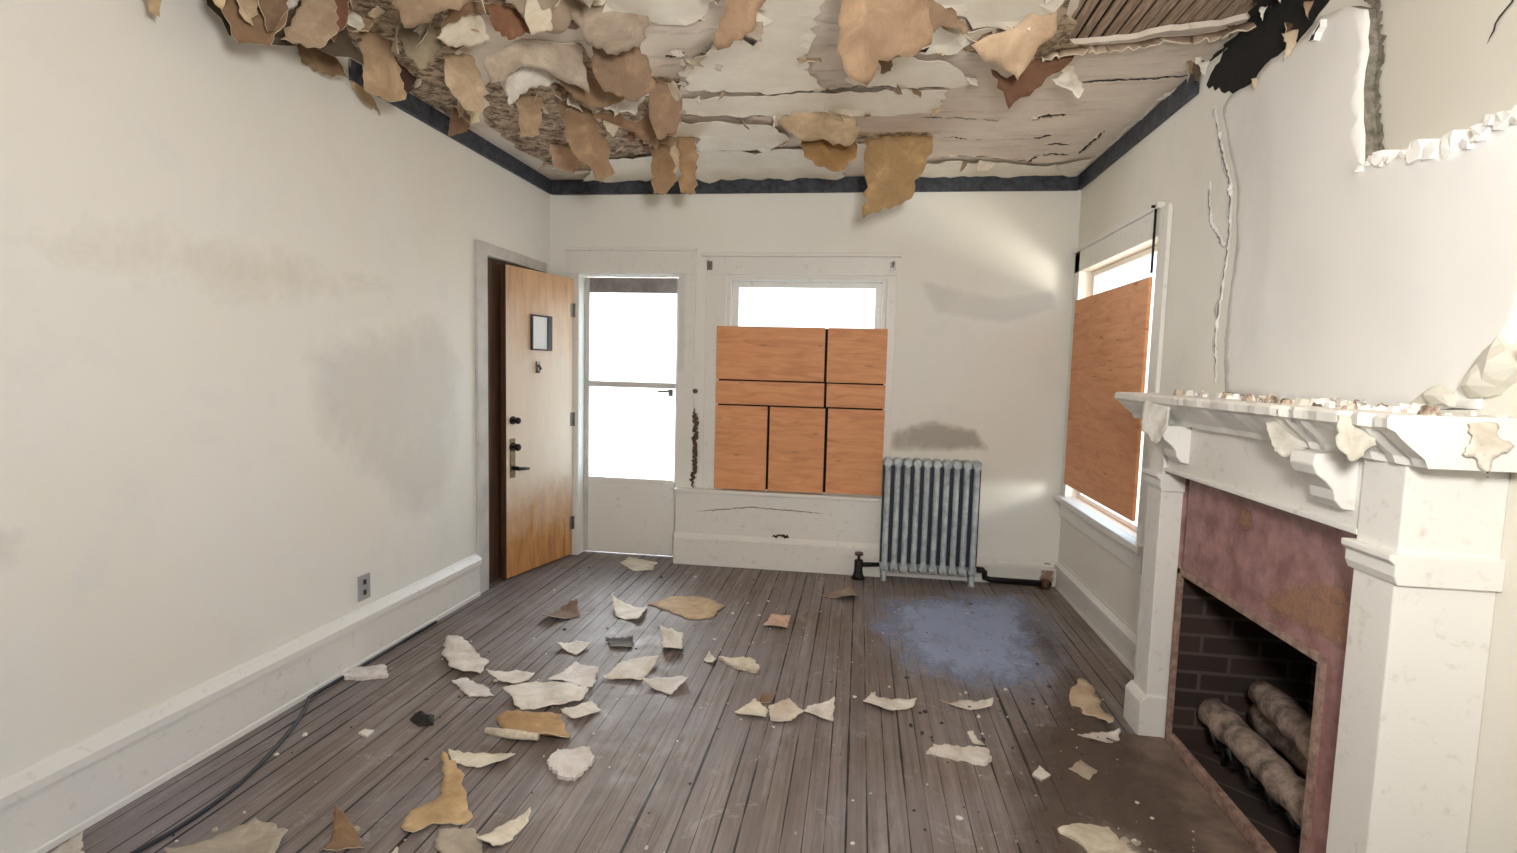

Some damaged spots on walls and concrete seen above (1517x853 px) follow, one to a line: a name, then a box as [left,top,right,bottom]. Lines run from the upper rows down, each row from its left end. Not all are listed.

peeling [583,156,653,183]
peeling [592,0,720,26]
peeling [667,0,1064,183]
crack [661,18,1188,163]
flaking render [920,0,1330,178]
crack [1207,106,1233,385]
flaking render [1355,0,1517,172]